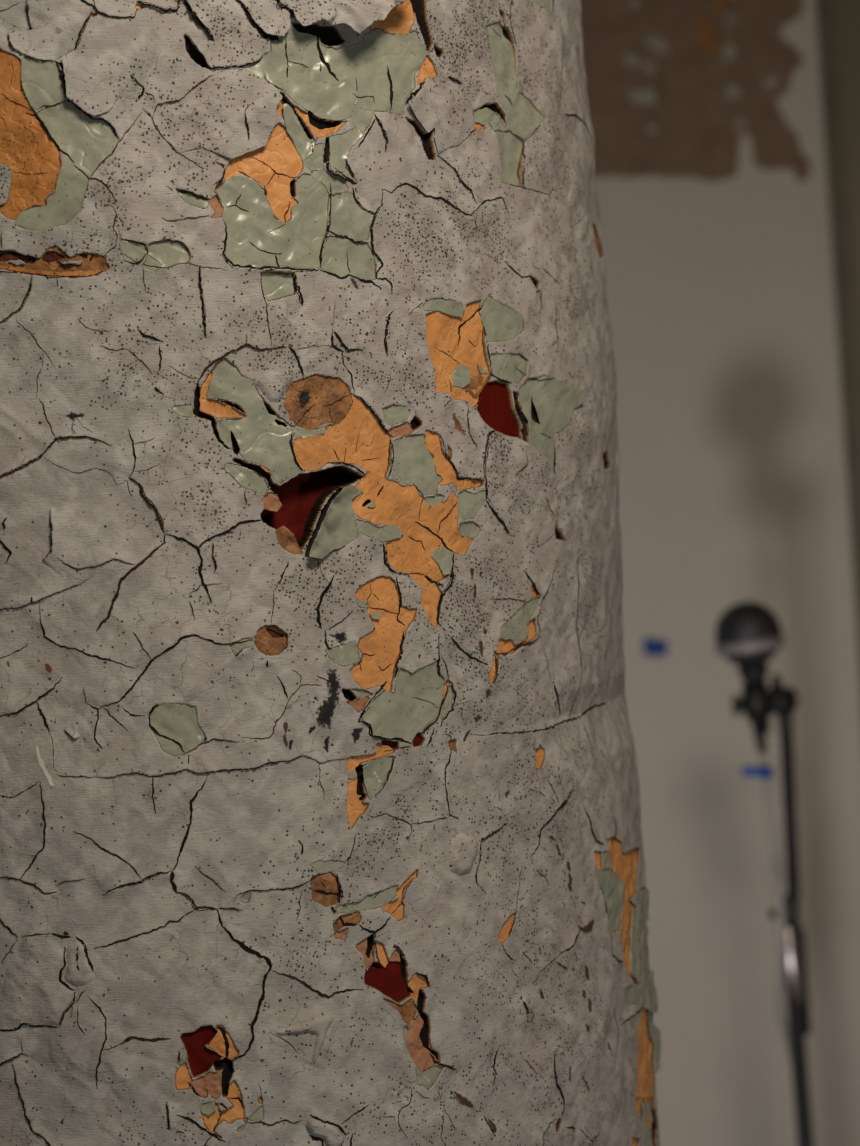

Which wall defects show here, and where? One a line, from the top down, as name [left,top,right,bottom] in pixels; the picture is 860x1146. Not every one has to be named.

peeling [0,0,131,230]
crack [74,0,394,395]
peeling [158,0,554,347]
crack [358,113,509,228]
crack [0,278,363,1062]
peeling [173,297,585,828]
crack [348,497,605,862]
crack [88,996,171,1087]
peeling [176,1025,263,1138]
crack [166,1083,302,1146]
peeling [310,861,455,1089]
peeling [584,807,661,1146]